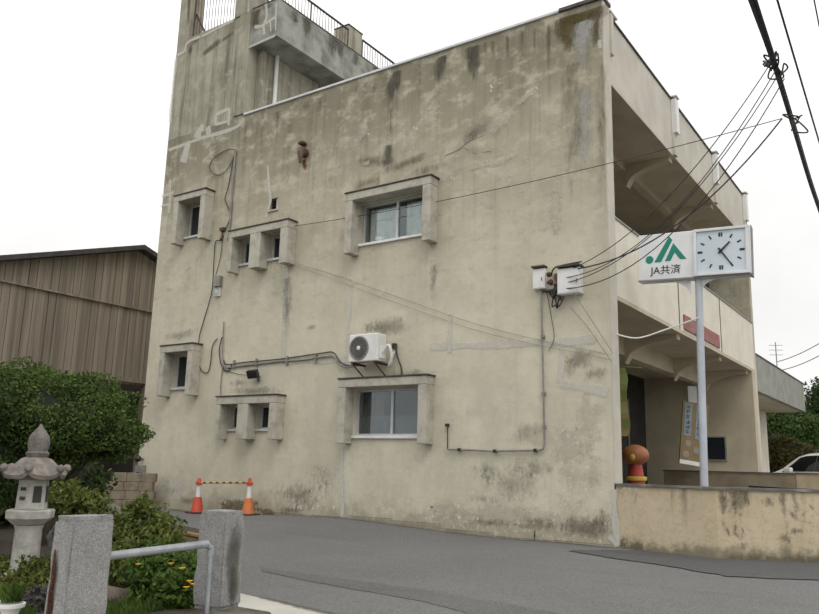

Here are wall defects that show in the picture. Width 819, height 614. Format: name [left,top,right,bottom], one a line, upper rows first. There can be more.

leakage [547,3,608,52]
leakage [468,45,479,73]
leakage [388,71,400,97]
corrosion [46,549,57,614]